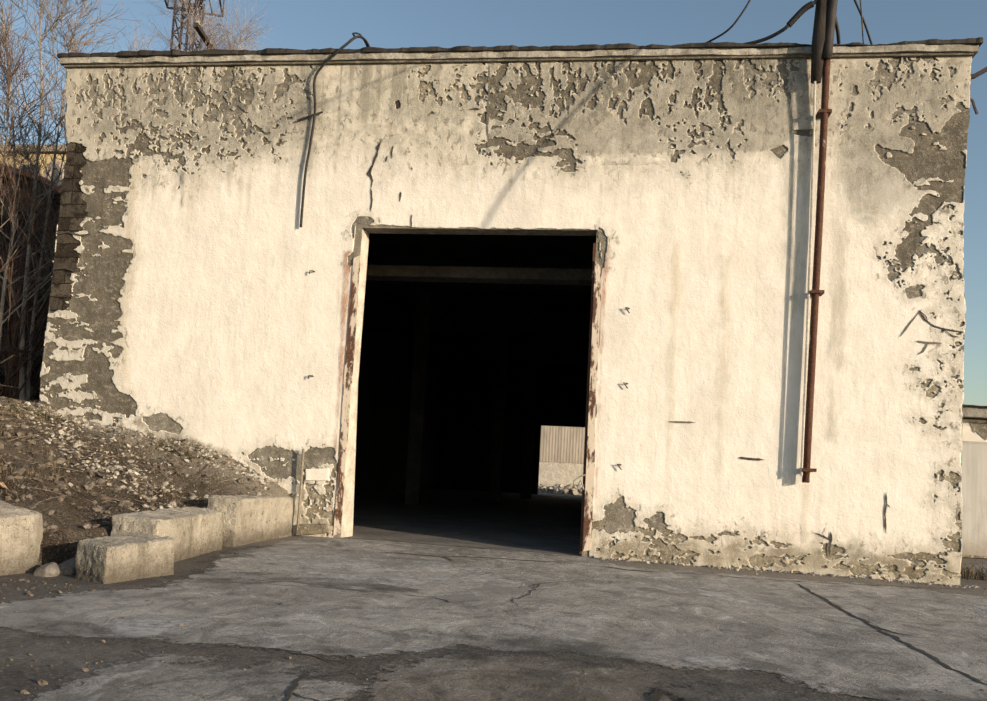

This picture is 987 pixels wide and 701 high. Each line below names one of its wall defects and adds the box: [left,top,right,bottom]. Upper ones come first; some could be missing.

peeling [408,59,801,176]
crack [366,141,413,210]
peeling [865,57,970,301]
peeling [39,65,314,434]
peeling [912,321,965,430]
peeling [970,422,987,440]
peeling [241,444,339,536]
flaking render [592,496,809,573]
crack [816,532,832,558]
flaking render [820,512,962,581]
flaking render [934,469,961,495]
crack [603,566,987,685]